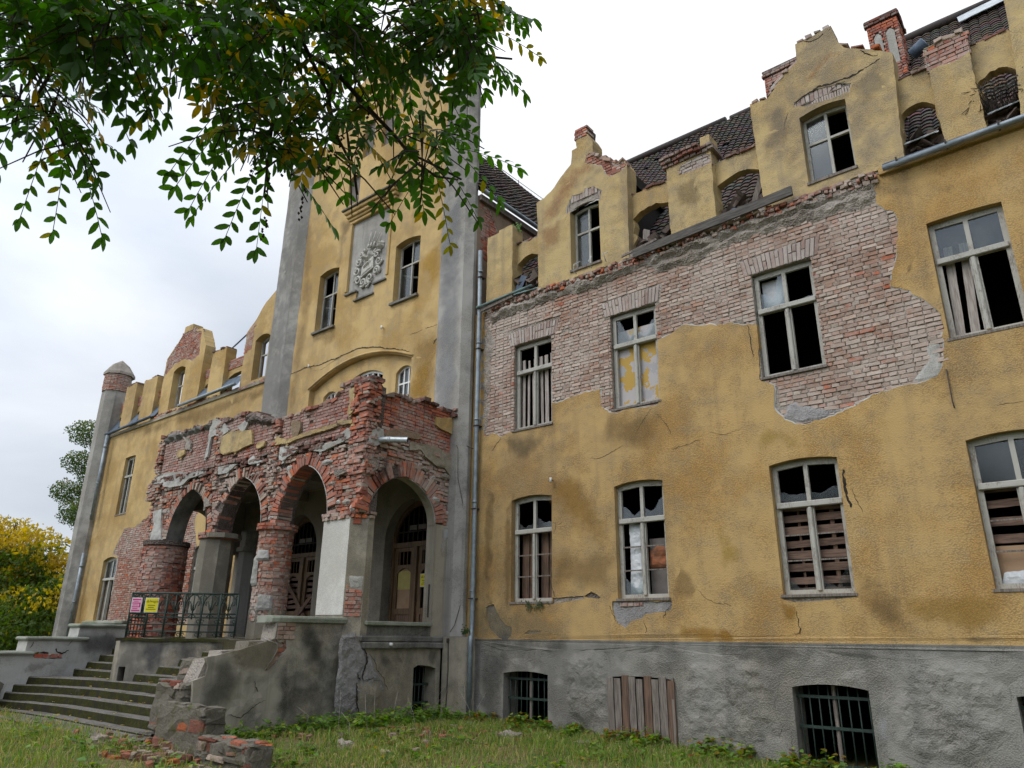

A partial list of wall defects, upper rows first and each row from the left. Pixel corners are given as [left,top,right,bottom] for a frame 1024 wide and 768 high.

crack [784,50,880,130]
flaking render [479,202,950,437]
flaking render [153,387,356,488]
flaking render [362,428,422,475]
crack [842,469,863,512]
flaking render [107,509,164,621]
flaking render [177,497,212,623]
flaking render [613,601,672,628]
crack [356,649,388,712]